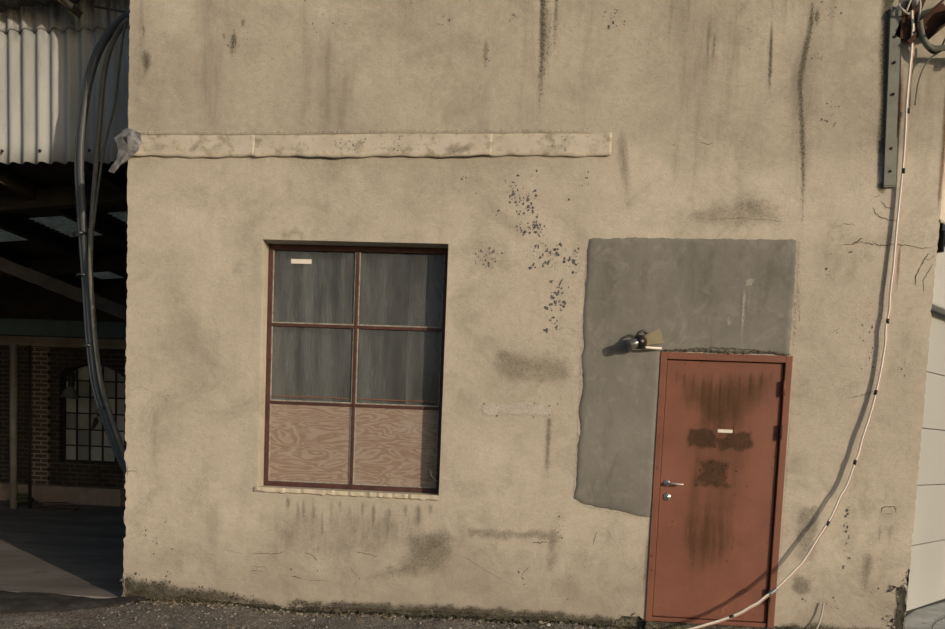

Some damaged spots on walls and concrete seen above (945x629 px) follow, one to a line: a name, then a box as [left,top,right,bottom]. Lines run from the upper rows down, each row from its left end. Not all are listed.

damp [538,0,558,95]
damp [798,3,820,201]
crack [841,196,935,292]
spalling [495,174,645,520]
rust [689,429,752,450]
spalling [862,569,910,628]